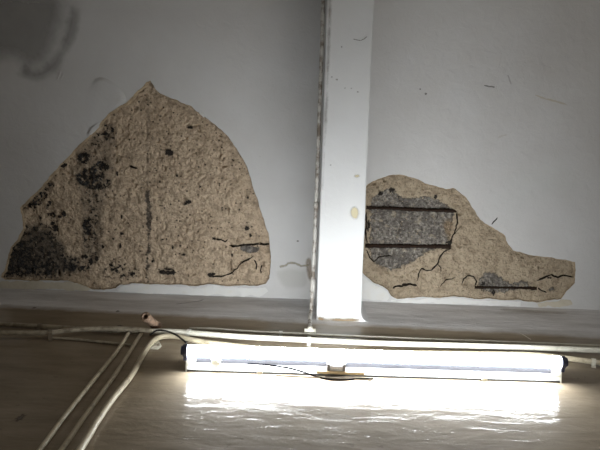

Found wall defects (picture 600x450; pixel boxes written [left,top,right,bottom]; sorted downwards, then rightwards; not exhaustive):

spalling [1,81,271,297]
spalling [362,175,576,307]